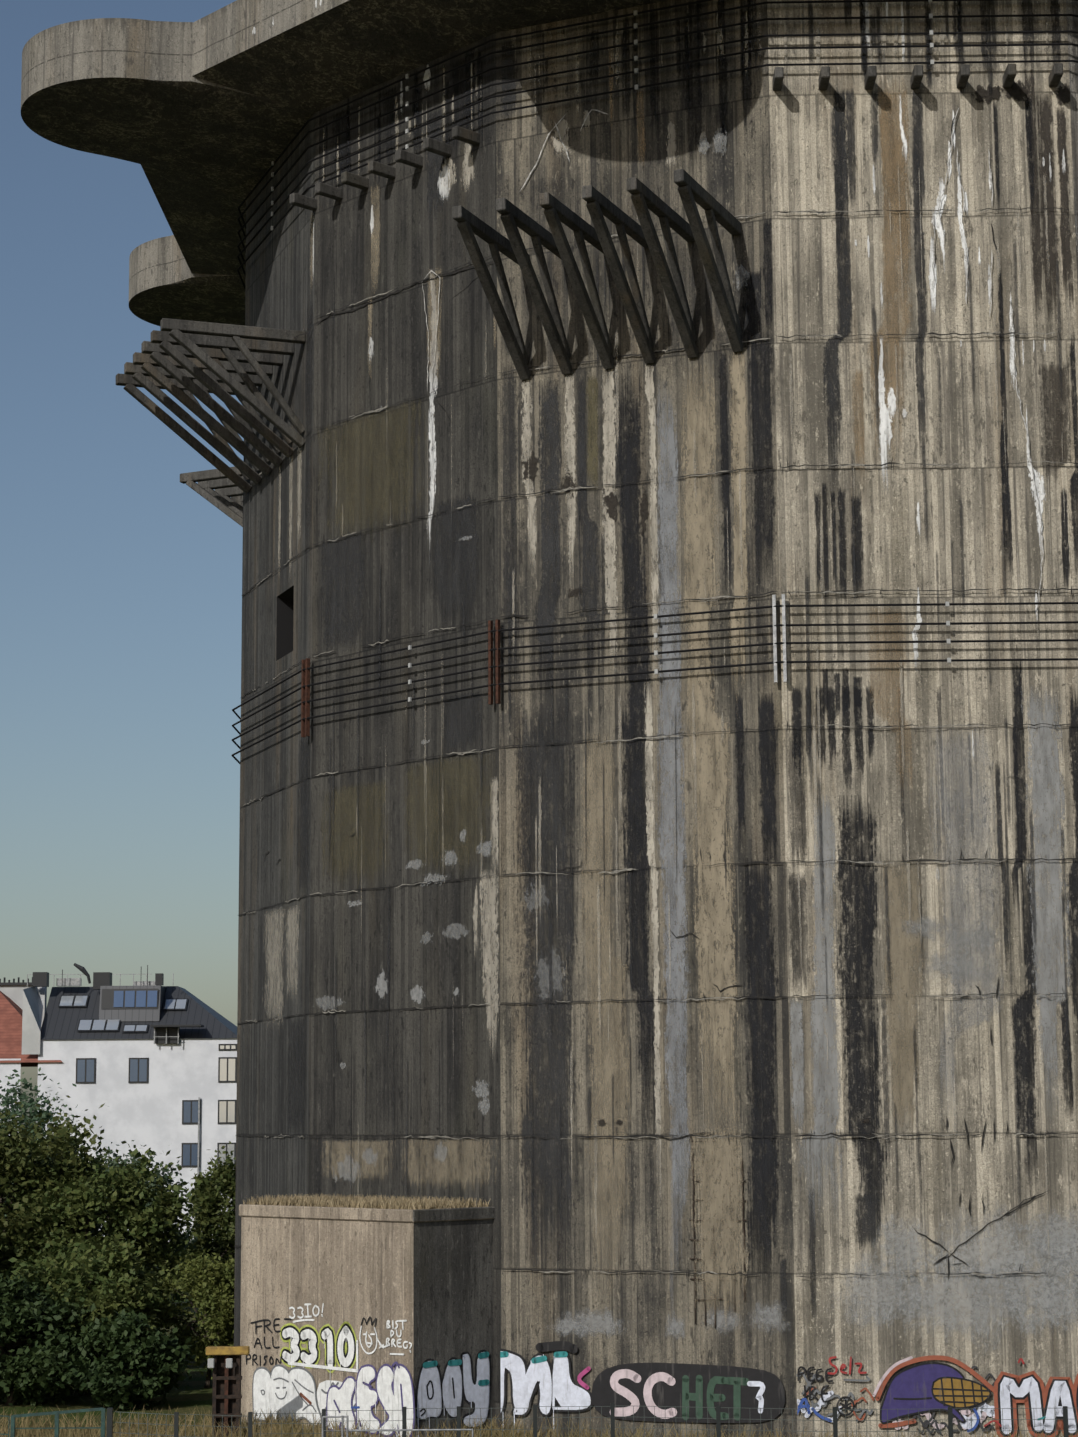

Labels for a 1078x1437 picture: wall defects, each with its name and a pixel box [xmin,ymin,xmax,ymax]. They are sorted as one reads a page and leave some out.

damp [427,272,481,636]
damp [278,316,381,691]
damp [439,0,1078,1312]
peeling [406,830,492,886]
peeling [375,971,388,998]
peeling [410,985,425,1004]
peeling [472,1080,490,1115]